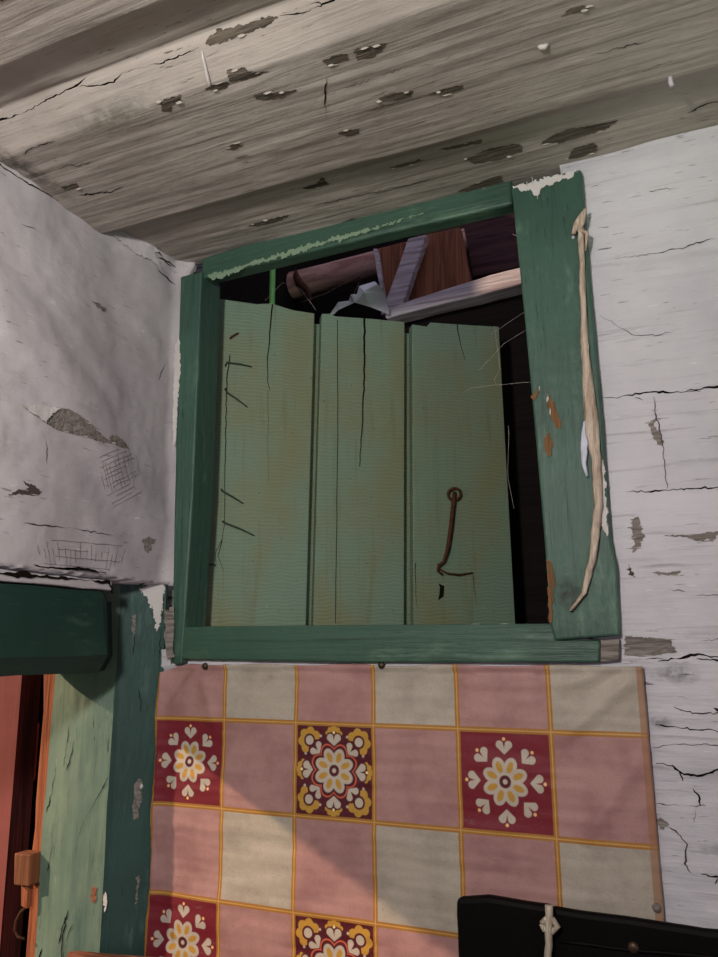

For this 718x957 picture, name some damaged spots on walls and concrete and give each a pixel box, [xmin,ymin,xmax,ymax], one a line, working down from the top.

peeling [206,16,278,46]
crack [0,48,197,121]
crack [0,141,53,197]
peeling [23,404,128,448]
crack [604,385,718,493]
crack [653,706,718,817]
crack [670,828,718,884]